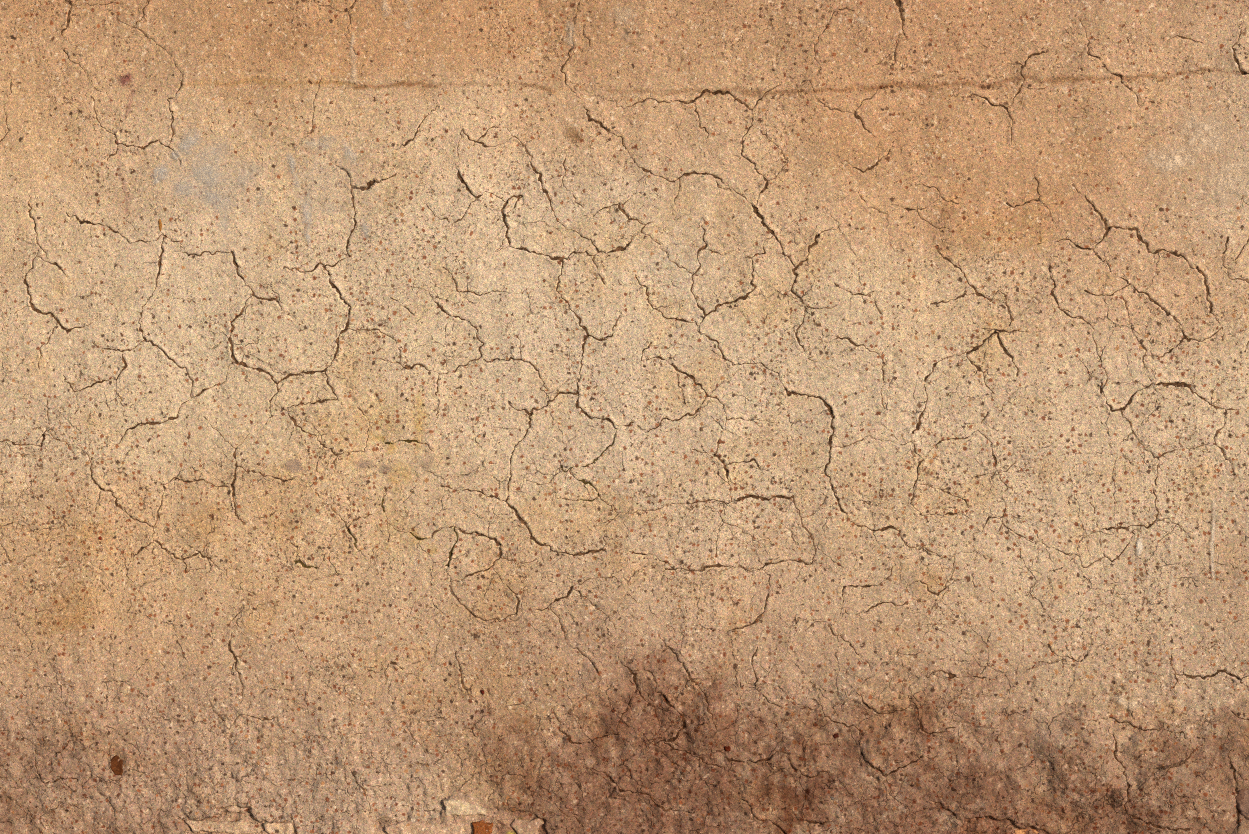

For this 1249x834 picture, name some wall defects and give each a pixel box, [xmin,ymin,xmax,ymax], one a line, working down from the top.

crack [14,0,1249,633]
crack [0,400,296,729]
crack [403,641,474,754]
crack [585,763,695,814]
crack [536,576,855,804]
crack [742,799,834,834]
crack [808,566,908,669]
crack [813,686,956,776]
crack [926,670,987,679]
crack [1048,632,1093,662]
crack [1065,710,1240,833]
crack [1171,653,1249,720]